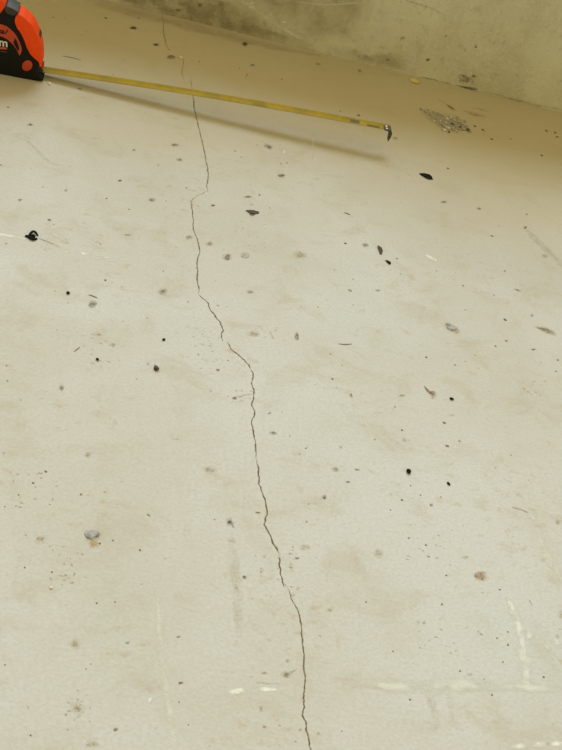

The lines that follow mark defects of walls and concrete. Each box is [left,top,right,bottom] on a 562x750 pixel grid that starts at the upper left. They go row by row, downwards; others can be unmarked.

crack [181,59,311,750]